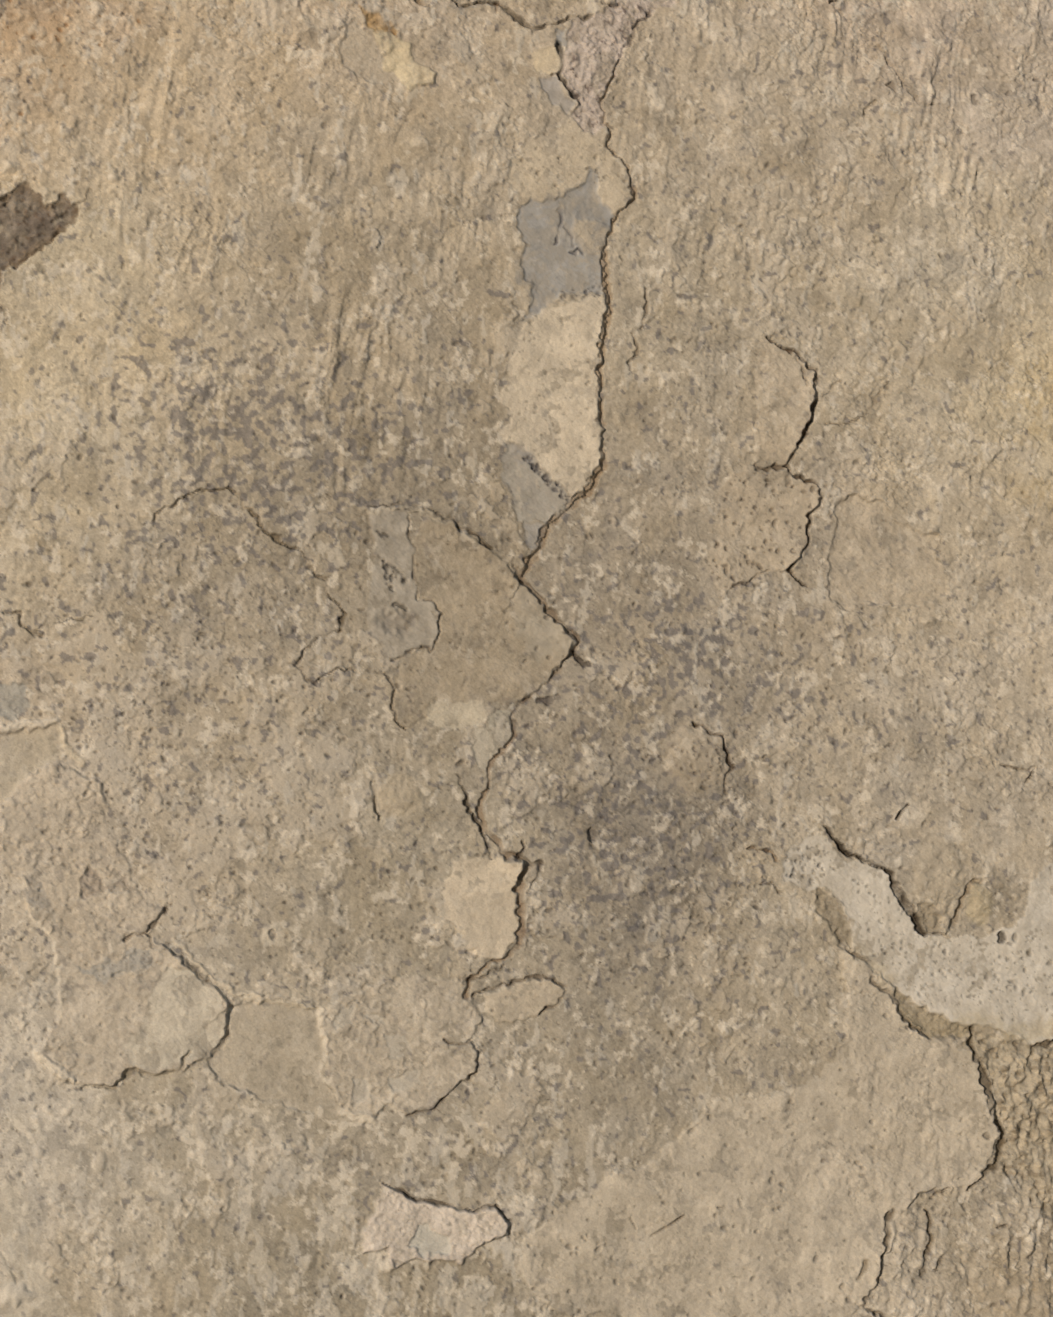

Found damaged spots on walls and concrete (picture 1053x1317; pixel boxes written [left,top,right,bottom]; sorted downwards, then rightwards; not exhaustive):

crack [829,0,845,33]
crack [863,45,935,114]
spalling [0,182,92,325]
flaking render [500,0,676,552]
crack [153,487,407,729]
crack [369,0,653,1003]
crack [730,337,884,590]
flaking render [363,836,1053,1317]
crack [835,929,933,1040]
crack [856,1026,1007,1317]